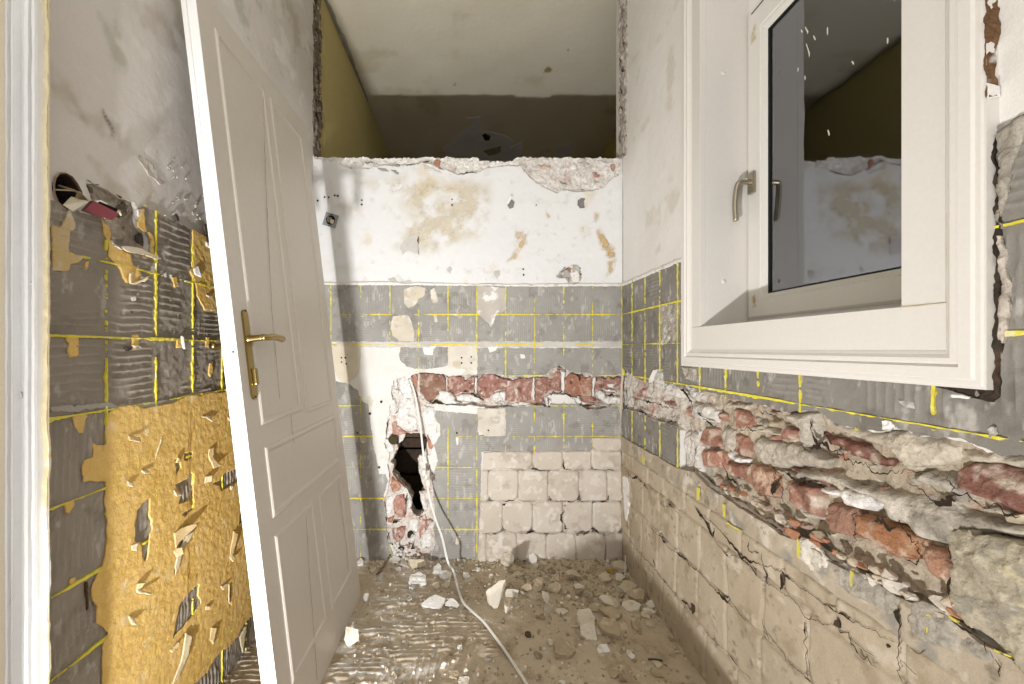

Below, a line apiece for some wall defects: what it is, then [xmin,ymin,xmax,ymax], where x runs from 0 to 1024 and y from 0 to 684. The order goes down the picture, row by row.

peeling [983,0,1001,99]
flaking render [312,0,628,193]
flaking render [86,179,161,260]
flaking render [994,116,1024,343]
peeling [205,447,221,483]
spalling [390,286,1024,674]
peeling [174,524,198,574]
peeling [229,531,238,562]
crack [518,460,924,683]
peeling [170,633,192,684]
peeling [239,626,247,653]
crack [950,620,1013,677]